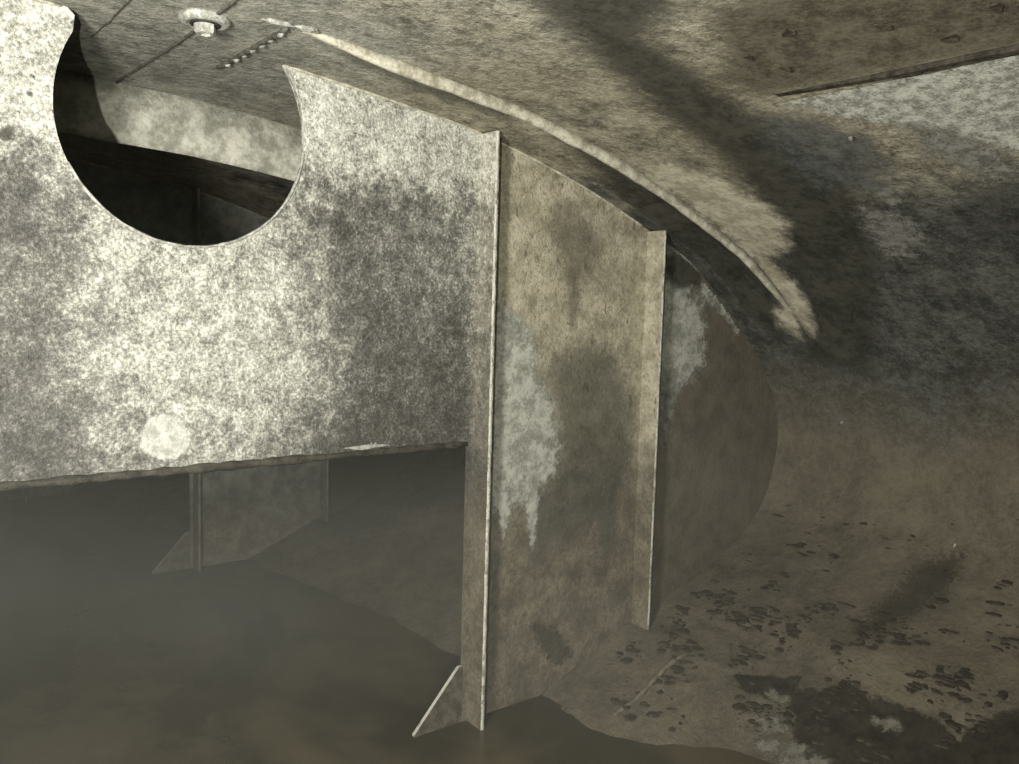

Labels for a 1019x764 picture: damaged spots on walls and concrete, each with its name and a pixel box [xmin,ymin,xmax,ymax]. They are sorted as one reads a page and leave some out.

water stain [363,61,505,117]
water stain [538,0,1019,449]
water stain [490,305,627,548]
water stain [733,674,1019,764]